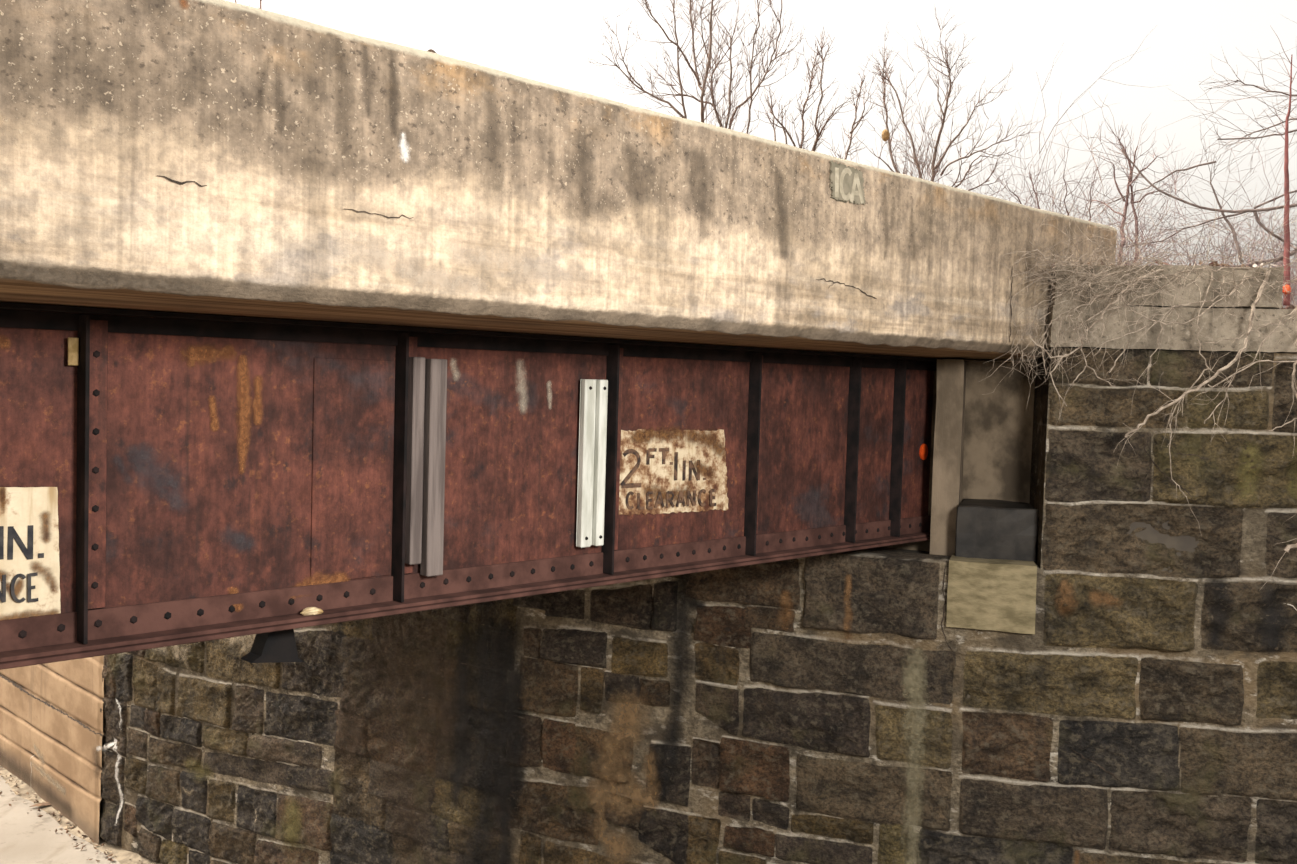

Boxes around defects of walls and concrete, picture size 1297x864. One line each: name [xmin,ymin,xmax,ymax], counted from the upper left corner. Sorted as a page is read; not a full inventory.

crack [157,175,207,187]
crack [347,209,413,219]
crack [817,278,877,299]
corrosion [188,347,262,473]
corrosion [632,430,724,455]
corrosion [694,461,713,476]
corrosion [42,513,50,542]
corrosion [0,563,58,620]
corrosion [297,574,348,587]
damp [436,601,523,864]